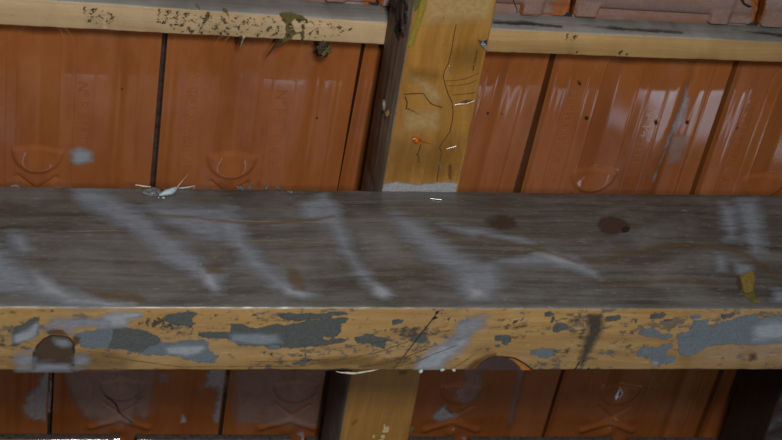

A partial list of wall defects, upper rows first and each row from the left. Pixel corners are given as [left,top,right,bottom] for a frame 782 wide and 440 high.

leakage [157,9,352,42]
crack [404,17,479,180]
leakage [77,188,309,297]
leakage [397,212,598,300]
peeling [0,310,484,370]
crack [304,310,473,369]
peeling [479,317,527,350]
peeling [530,348,569,359]
peeling [542,311,581,333]
peeling [624,312,782,365]
leakage [23,371,52,422]
leakage [64,370,169,425]